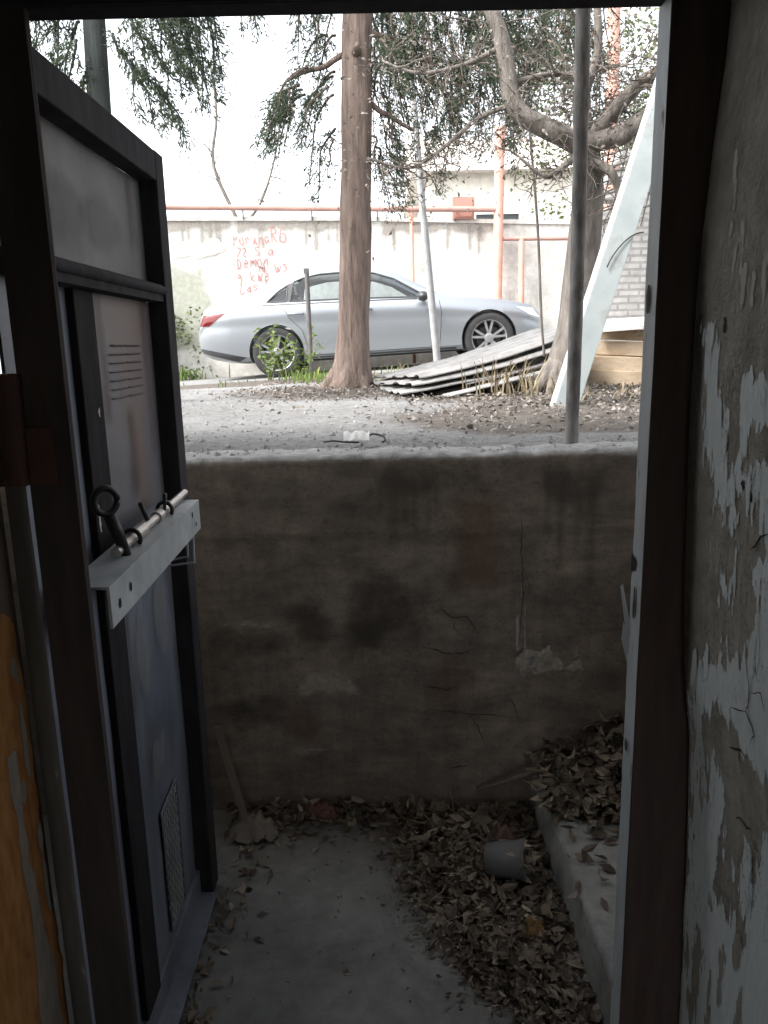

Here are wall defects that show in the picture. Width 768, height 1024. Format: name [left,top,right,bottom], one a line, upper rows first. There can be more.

spalling [515,645,587,677]
peeling [679,317,768,1024]
crack [729,669,765,763]